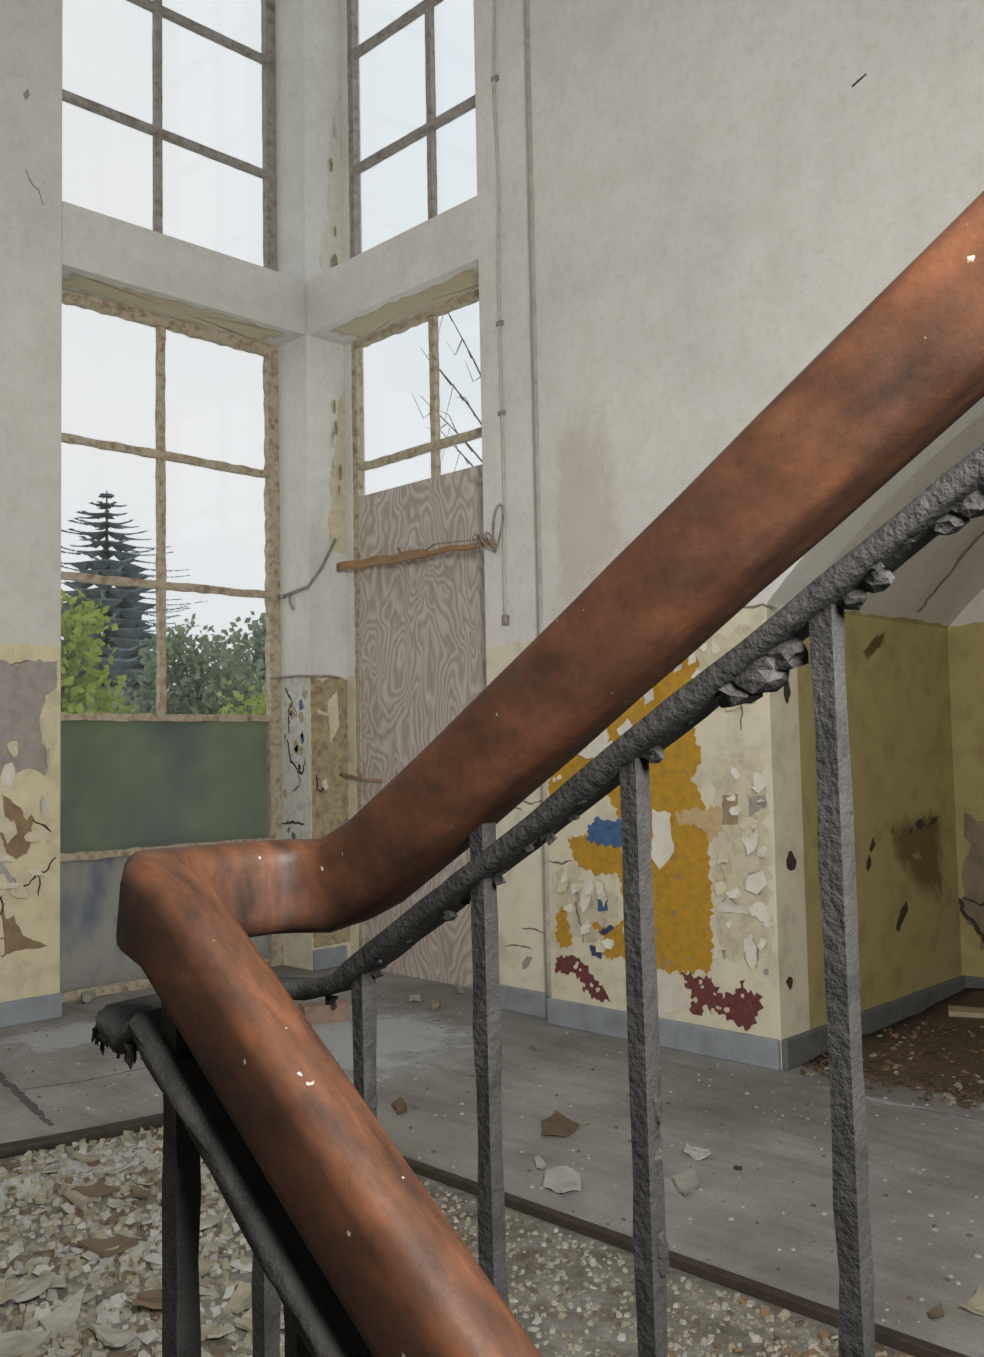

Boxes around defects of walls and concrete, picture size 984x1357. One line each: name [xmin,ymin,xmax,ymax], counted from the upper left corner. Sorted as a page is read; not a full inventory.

peeling [0,659,58,958]
peeling [281,677,349,839]
peeling [313,926,351,948]
peeling [523,785,625,1003]
peeling [548,624,756,795]
peeling [643,727,797,1031]
damp [892,816,941,889]
flaking render [961,812,984,951]